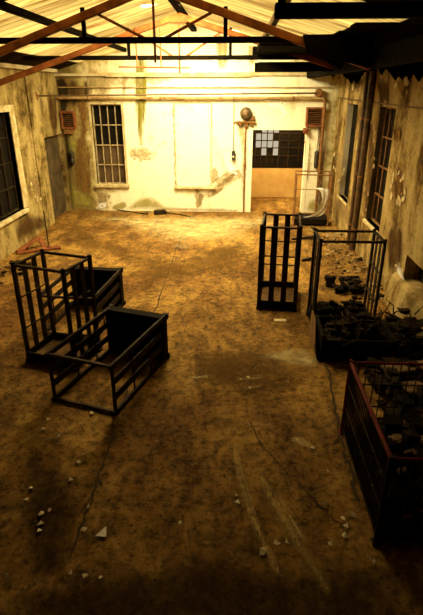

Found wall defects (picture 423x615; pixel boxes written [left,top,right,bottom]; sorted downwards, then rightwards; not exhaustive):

water stain [85,70,160,131]
peeling [129,142,156,161]
peeling [390,170,406,206]
crack [124,222,186,312]
crack [70,388,128,559]
crack [249,421,347,533]